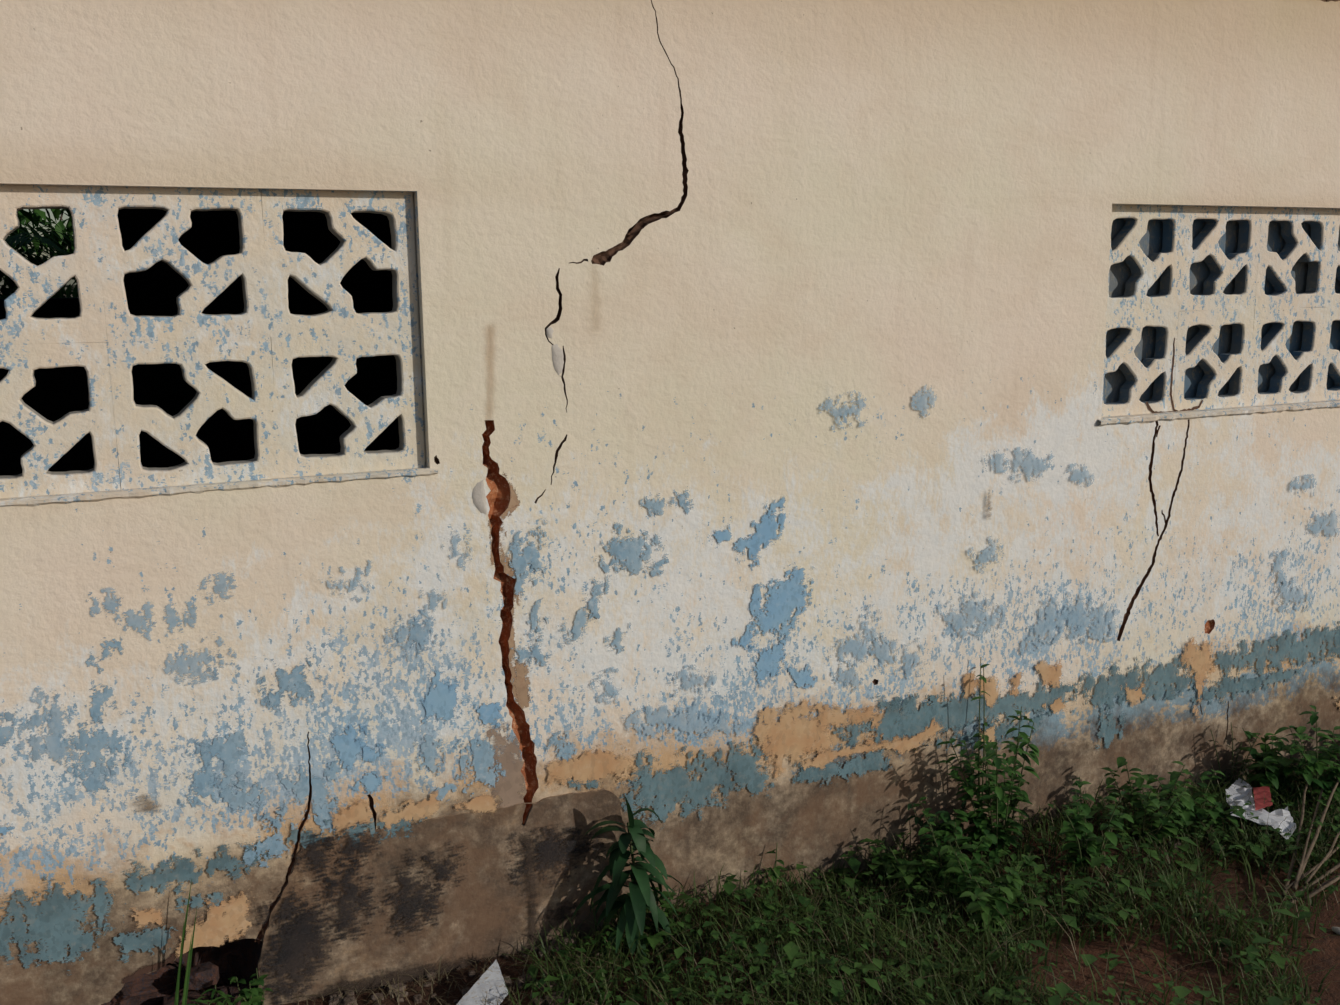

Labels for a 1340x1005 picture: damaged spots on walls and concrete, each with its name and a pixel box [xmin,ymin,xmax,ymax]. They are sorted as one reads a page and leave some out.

peeling [0,571,237,796]
peeling [257,657,325,712]
peeling [382,589,448,662]
crack [482,0,689,824]
peeling [505,486,694,666]
peeling [546,497,1340,825]
crack [1117,338,1203,641]
spalling [0,670,506,1005]
crack [254,732,312,944]
crack [367,794,377,829]
damp [257,820,496,1005]
damp [507,825,606,947]